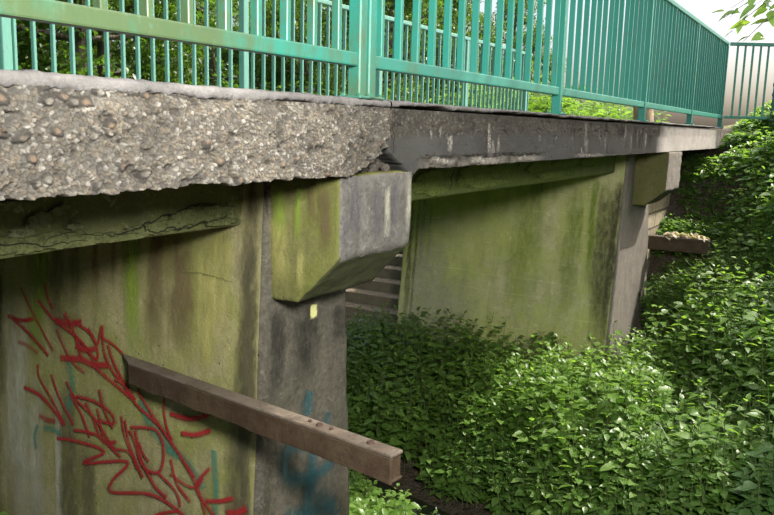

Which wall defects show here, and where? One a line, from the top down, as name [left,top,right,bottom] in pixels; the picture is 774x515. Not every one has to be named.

crack [0,203,229,247]
damp [171,247,226,356]
damp [239,187,284,398]
damp [588,191,621,313]
damp [231,429,250,515]